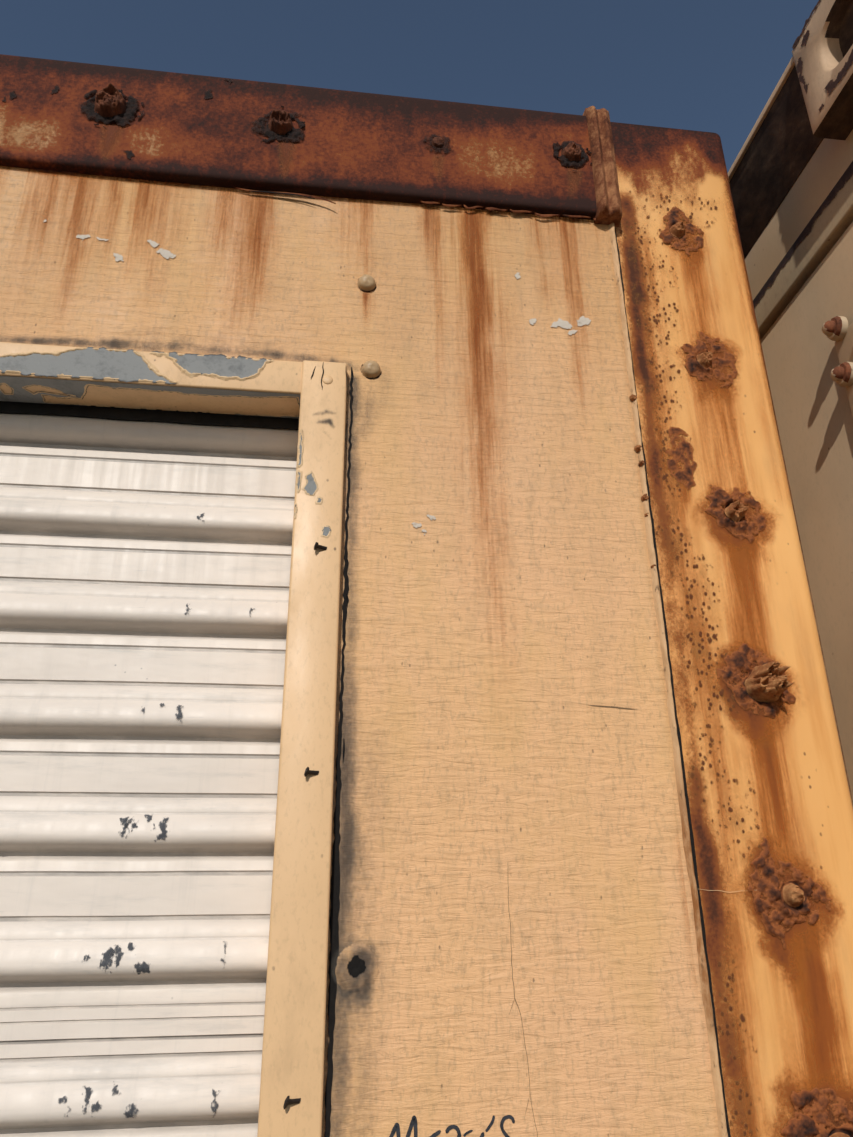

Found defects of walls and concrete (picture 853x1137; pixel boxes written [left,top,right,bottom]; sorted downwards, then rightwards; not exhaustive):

peeling [147,240,176,259]
rust [0,54,597,425]
peeling [551,316,591,335]
peeling [0,347,323,519]
peeling [321,525,332,538]
rust [611,122,853,1137]